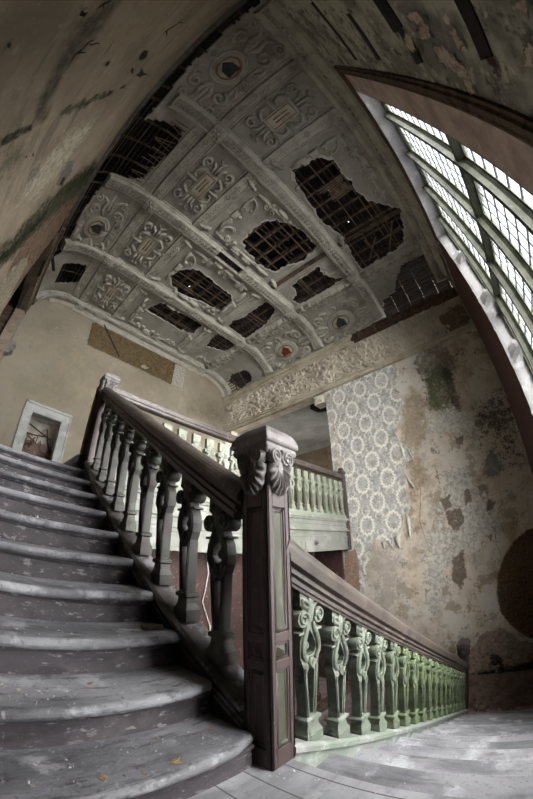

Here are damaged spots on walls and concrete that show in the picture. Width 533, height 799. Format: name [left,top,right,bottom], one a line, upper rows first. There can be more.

peeling [403,11,479,96]
damp [1,126,32,145]
flaking render [0,191,80,315]
damp [0,159,101,269]
flaking render [87,322,177,384]
flaking render [350,286,459,343]
damp [414,346,461,412]
peeling [422,466,505,616]